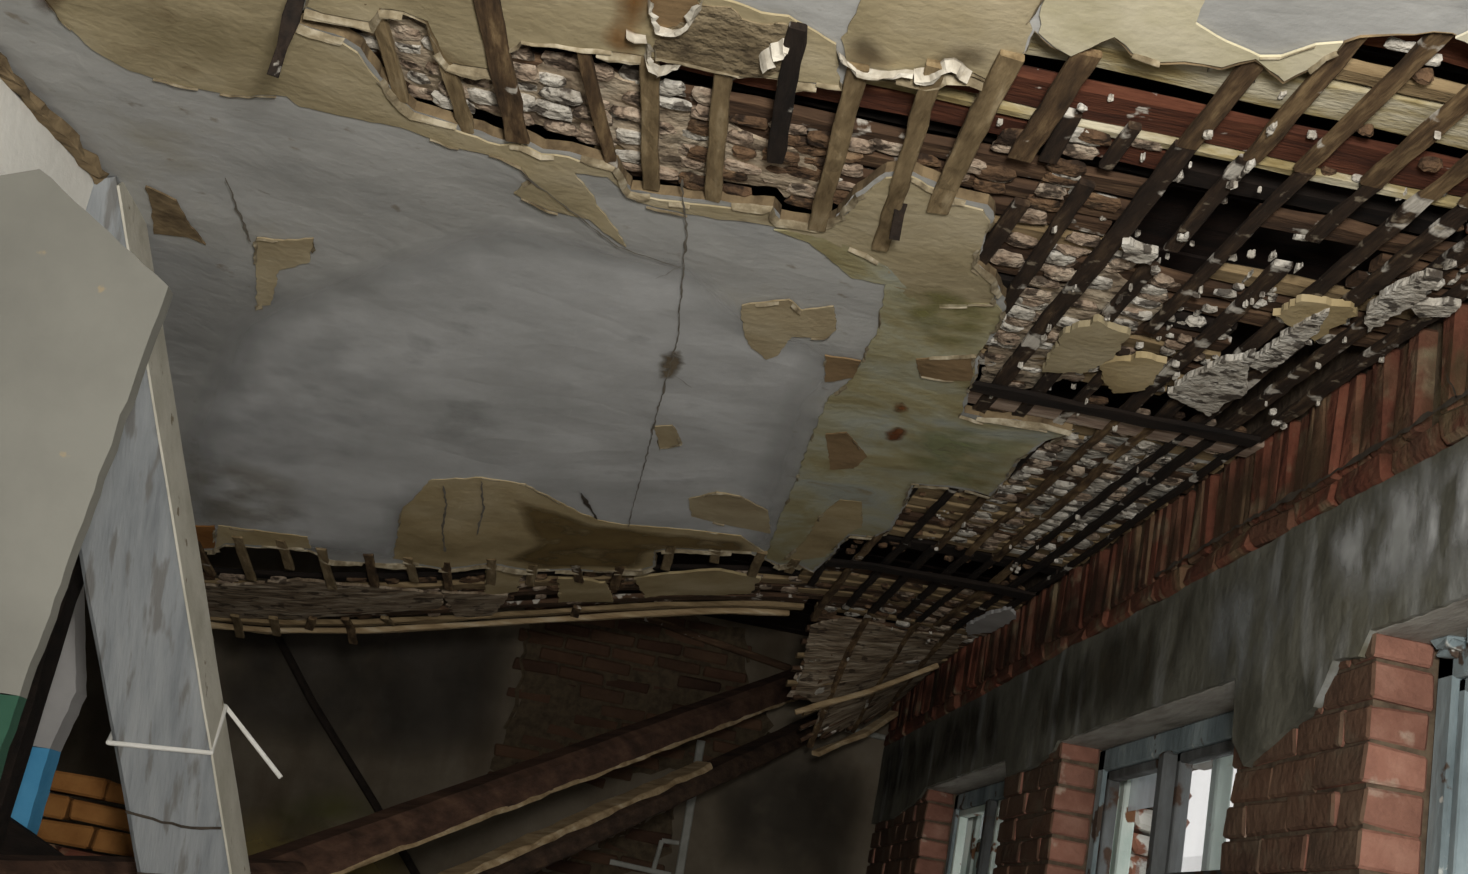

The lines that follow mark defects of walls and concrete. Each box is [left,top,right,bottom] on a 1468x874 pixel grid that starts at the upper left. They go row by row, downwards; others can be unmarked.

crack [521,173,688,526]
flaking render [195,229,1063,771]
flaking render [45,0,1468,635]
damp [1336,463,1468,587]
peeling [1431,628,1468,659]